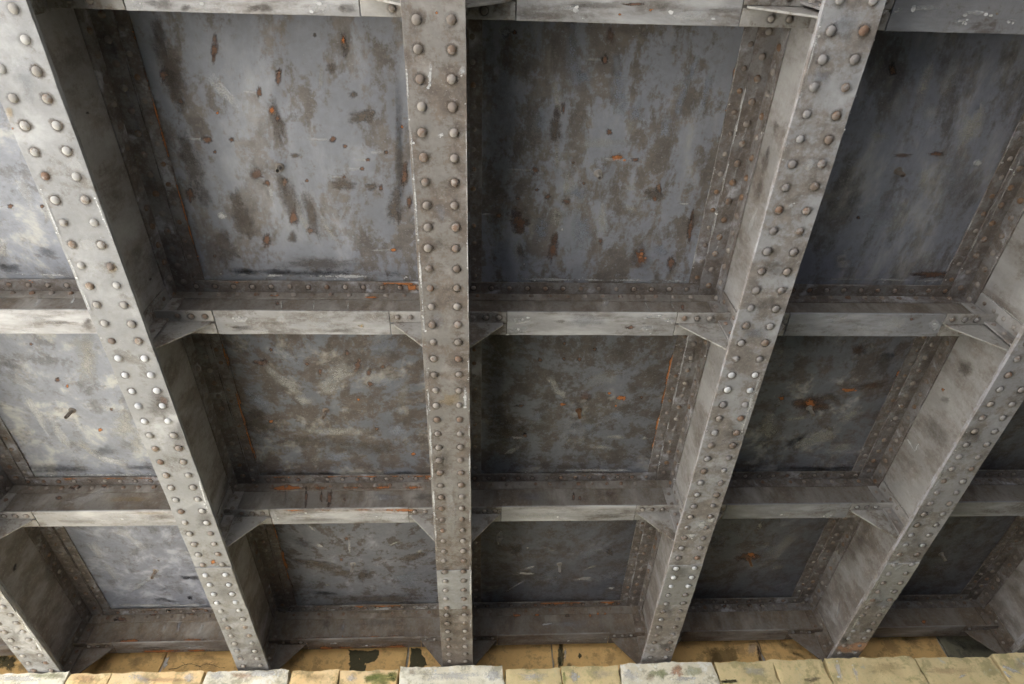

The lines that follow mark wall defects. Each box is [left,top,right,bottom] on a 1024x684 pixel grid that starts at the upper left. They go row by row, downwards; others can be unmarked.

rust [251,169,318,234]
rust [778,382,884,412]